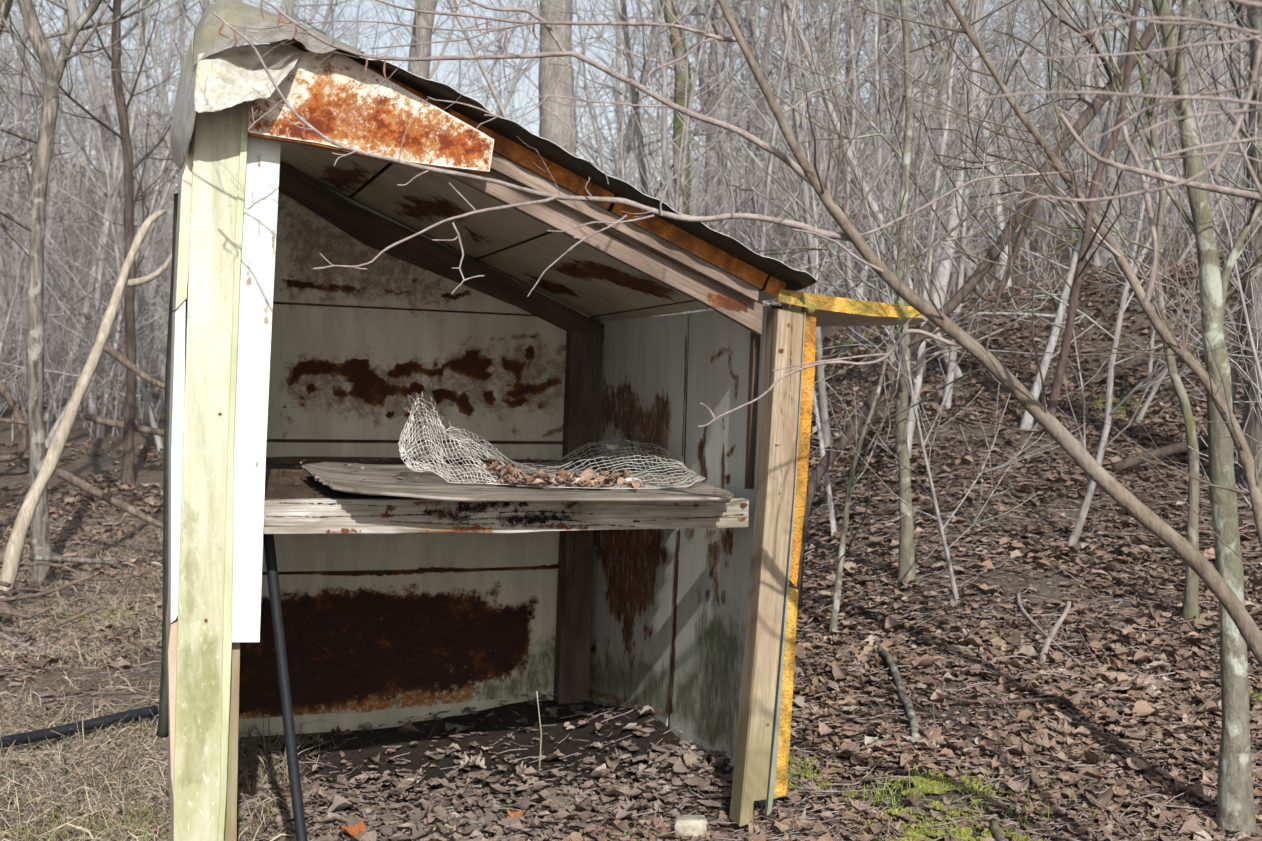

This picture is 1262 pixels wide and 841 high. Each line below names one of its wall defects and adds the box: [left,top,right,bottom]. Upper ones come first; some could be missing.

corrosion [250,53,493,194]
corrosion [524,258,678,303]
corrosion [287,334,561,420]
corrosion [600,339,738,489]
corrosion [239,564,558,719]
corrosion [589,528,733,718]